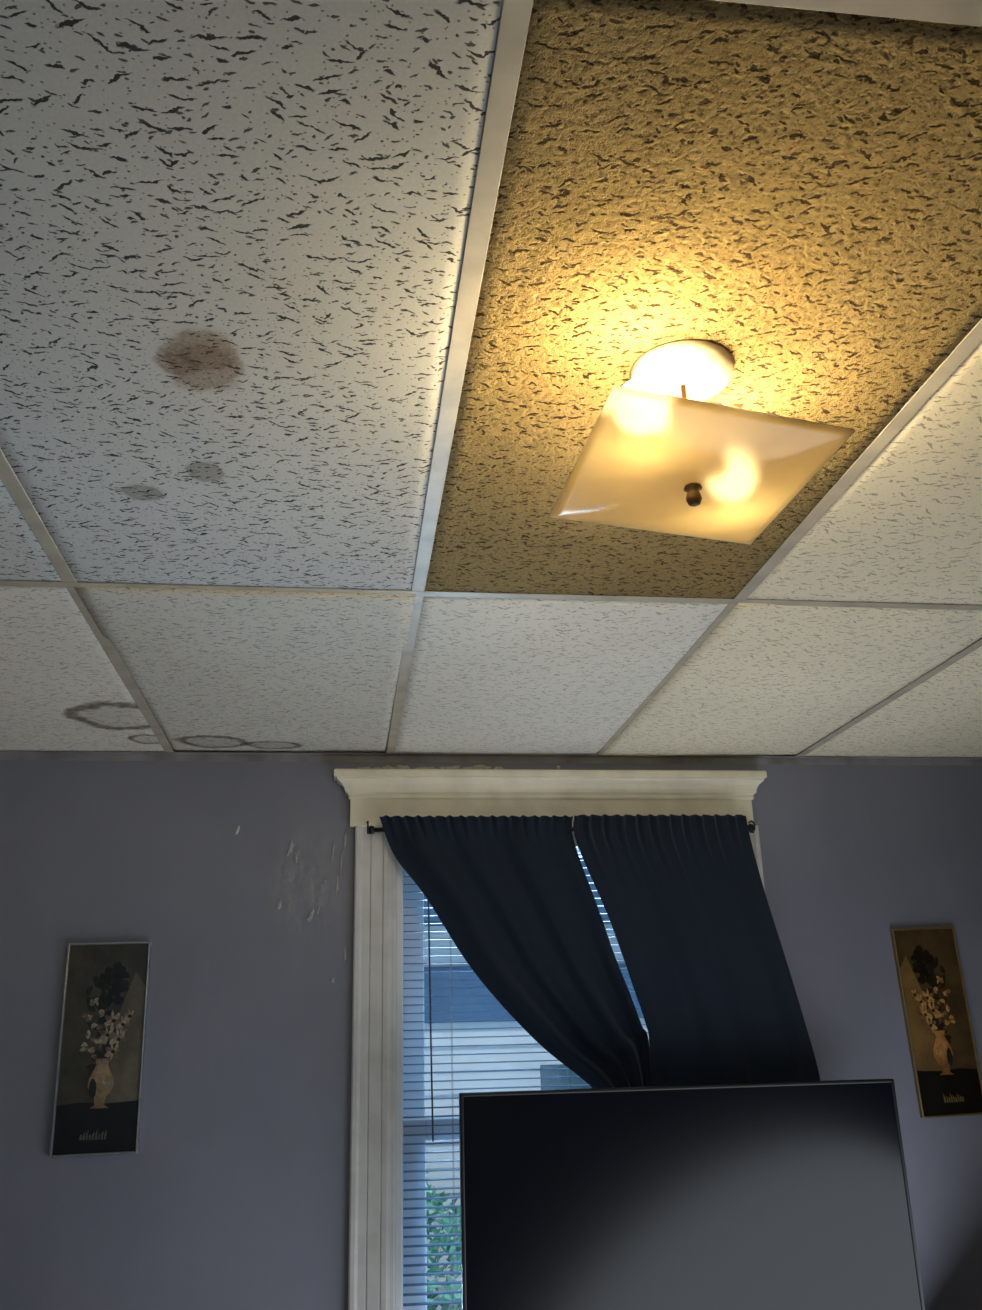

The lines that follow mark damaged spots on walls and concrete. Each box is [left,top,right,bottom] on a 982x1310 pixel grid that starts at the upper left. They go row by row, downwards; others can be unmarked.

leakage [69,703,152,744]